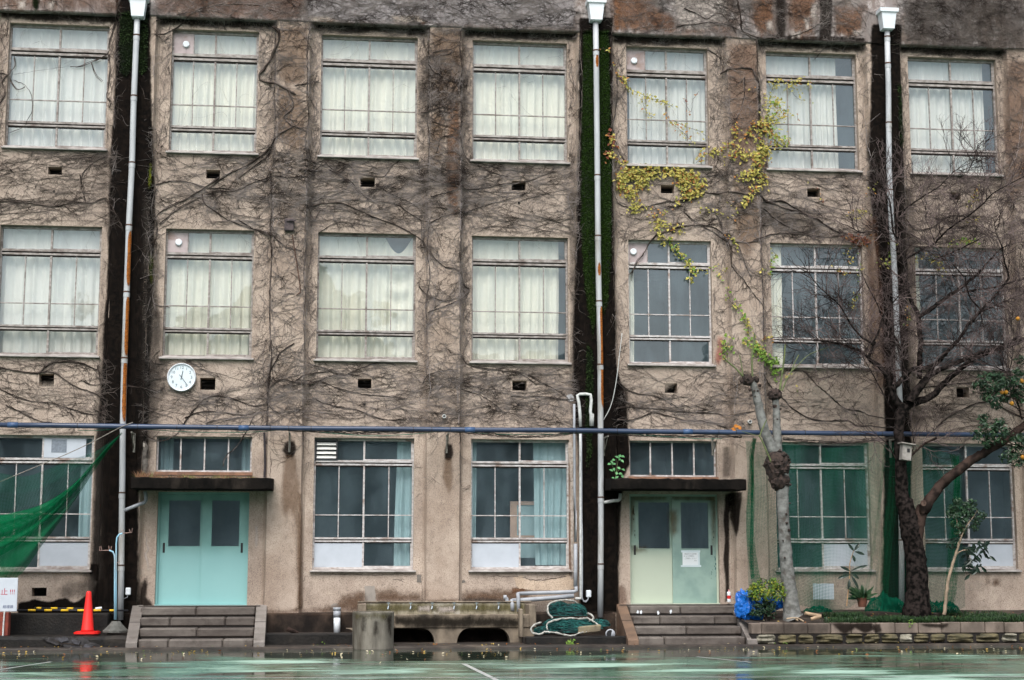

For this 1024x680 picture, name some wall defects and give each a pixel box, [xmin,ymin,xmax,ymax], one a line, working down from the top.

water stain [757,0,1022,607]